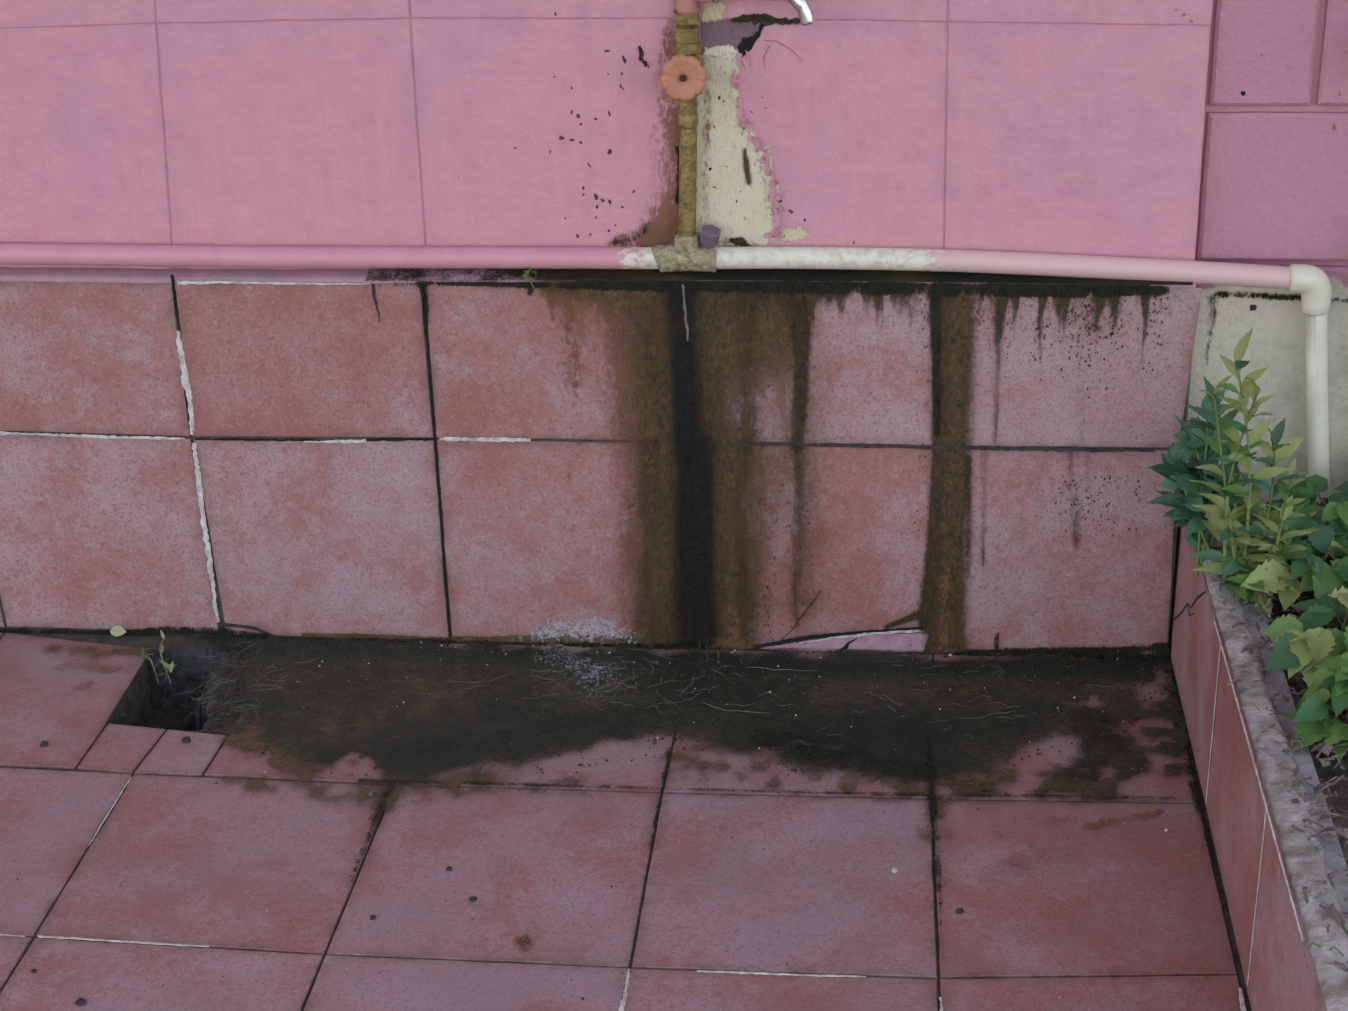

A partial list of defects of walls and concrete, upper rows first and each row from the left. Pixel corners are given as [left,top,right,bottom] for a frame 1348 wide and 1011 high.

corrosion [613,92,679,247]
peeling [696,0,815,247]
water stain [302,280,1169,691]
spalling [108,647,248,735]
crack [753,590,920,648]
crack [1172,591,1205,622]